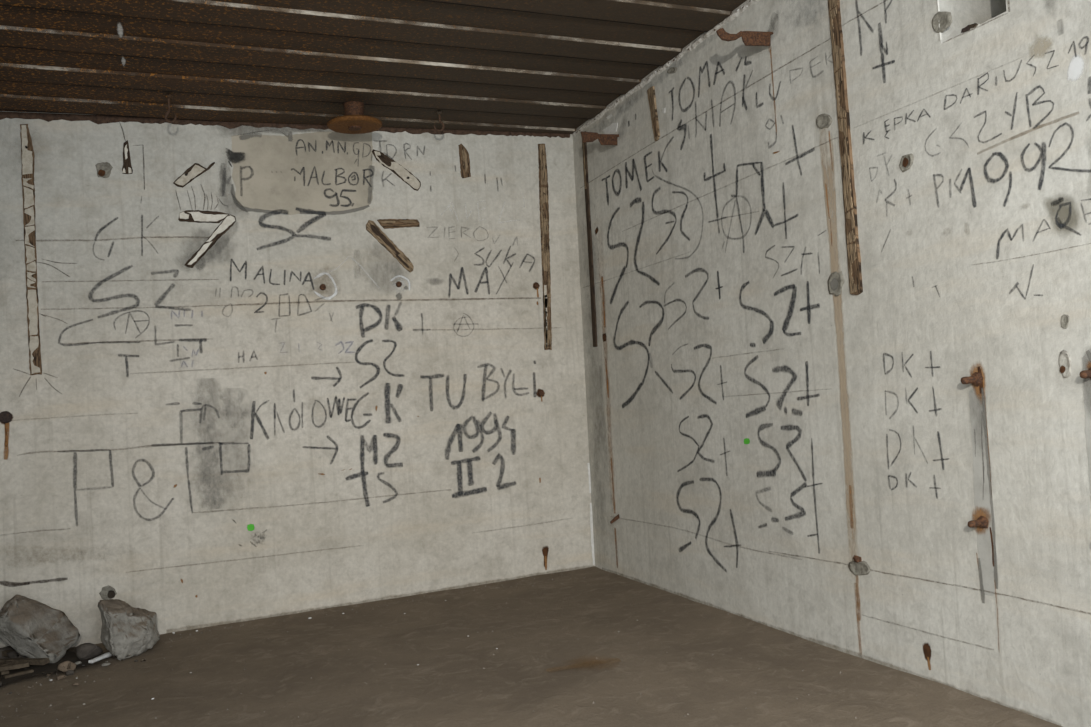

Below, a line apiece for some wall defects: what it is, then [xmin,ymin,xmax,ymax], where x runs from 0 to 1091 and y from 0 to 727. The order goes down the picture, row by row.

corrosion [1,415,13,460]
corrosion [971,365,991,474]
corrosion [923,643,931,670]